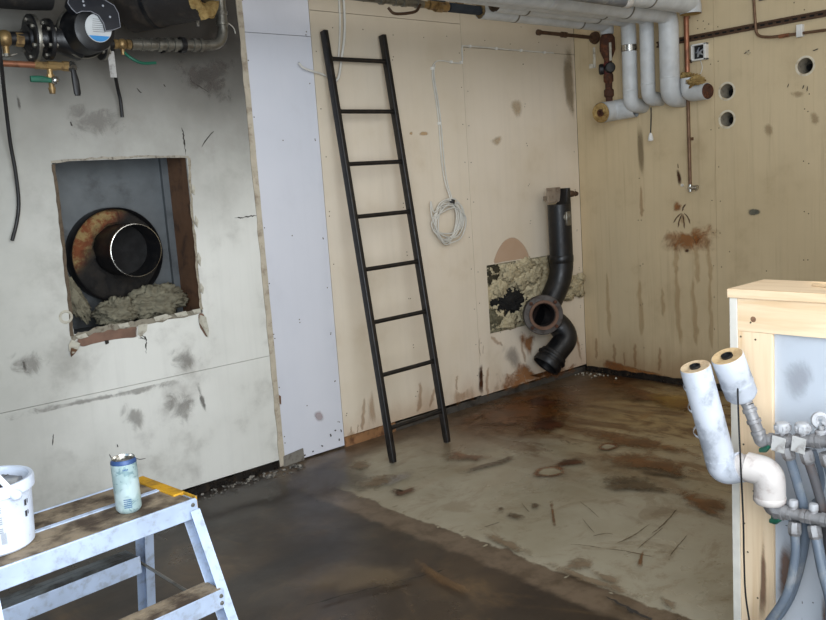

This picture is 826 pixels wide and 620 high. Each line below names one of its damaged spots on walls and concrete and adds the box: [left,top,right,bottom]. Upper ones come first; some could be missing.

corrosion [667,203,708,252]
spalling [490,288,528,316]